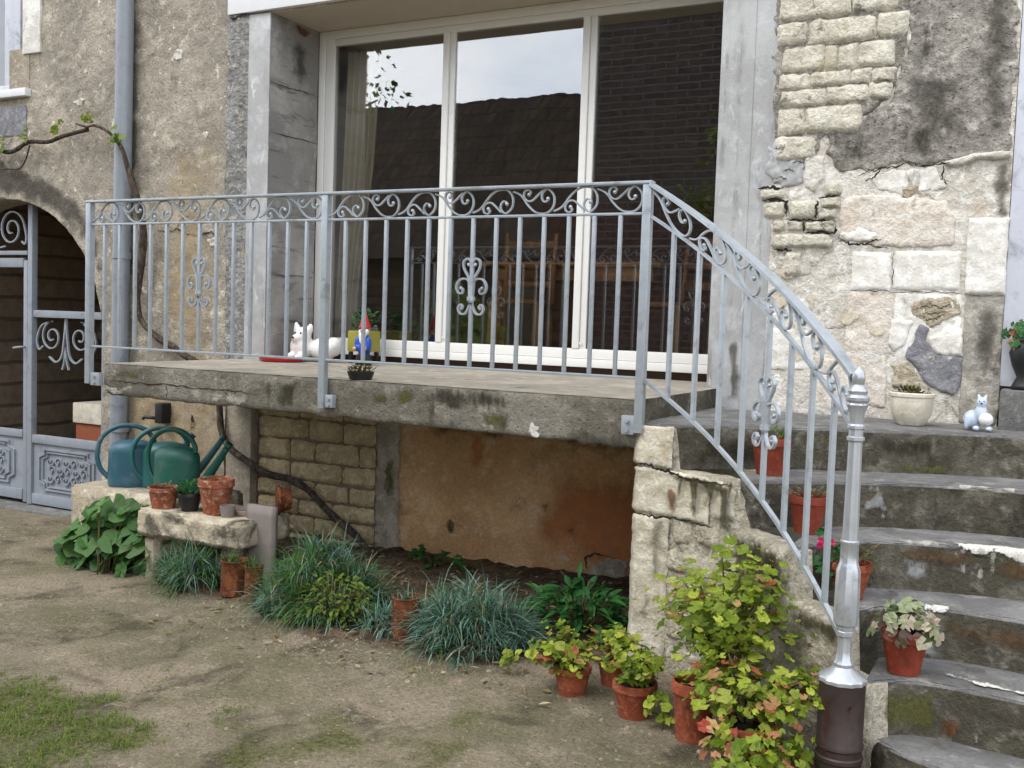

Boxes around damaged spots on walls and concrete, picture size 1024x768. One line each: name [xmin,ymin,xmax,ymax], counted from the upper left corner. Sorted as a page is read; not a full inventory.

leakage [921,81,955,134]
peeling [758,0,1021,279]
crack [859,161,947,184]
leakage [428,391,504,416]
crack [637,463,729,486]
rust [543,486,635,567]
crack [635,512,712,528]